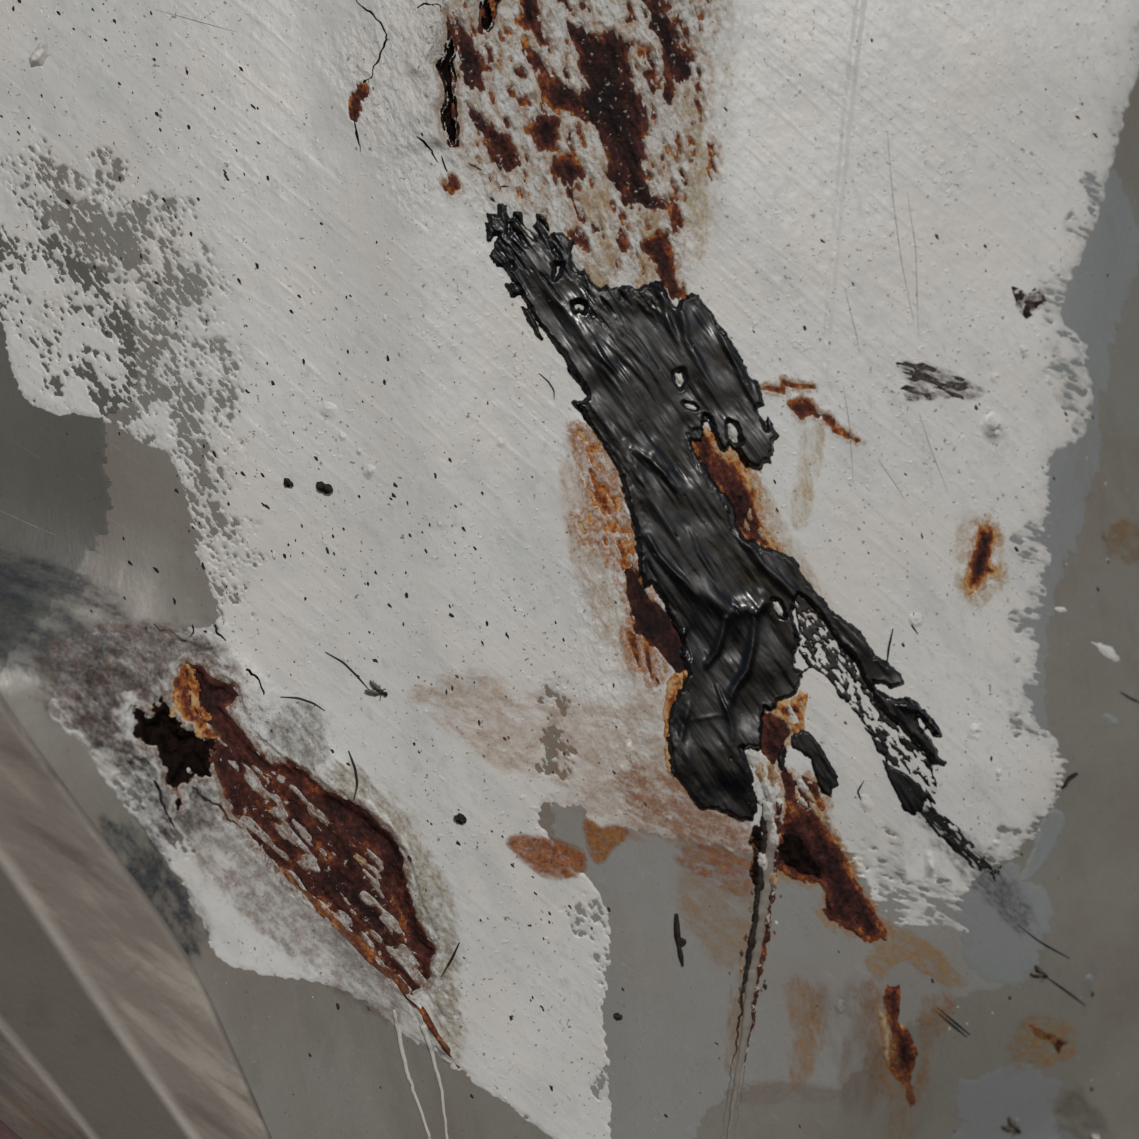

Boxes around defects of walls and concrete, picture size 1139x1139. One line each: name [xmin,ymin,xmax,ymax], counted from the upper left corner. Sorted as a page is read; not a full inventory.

corrosion [348,0,388,152]
corrosion [414,0,719,300]
spalling [1011,286,1046,319]
corrosion [692,428,784,551]
corrosion [961,519,1007,597]
corrosion [568,421,754,895]
corrosion [184,662,436,959]
corrosion [508,819,628,878]
peeling [758,801,779,888]
corrosion [746,689,961,985]
corrosion [278,865,460,1069]